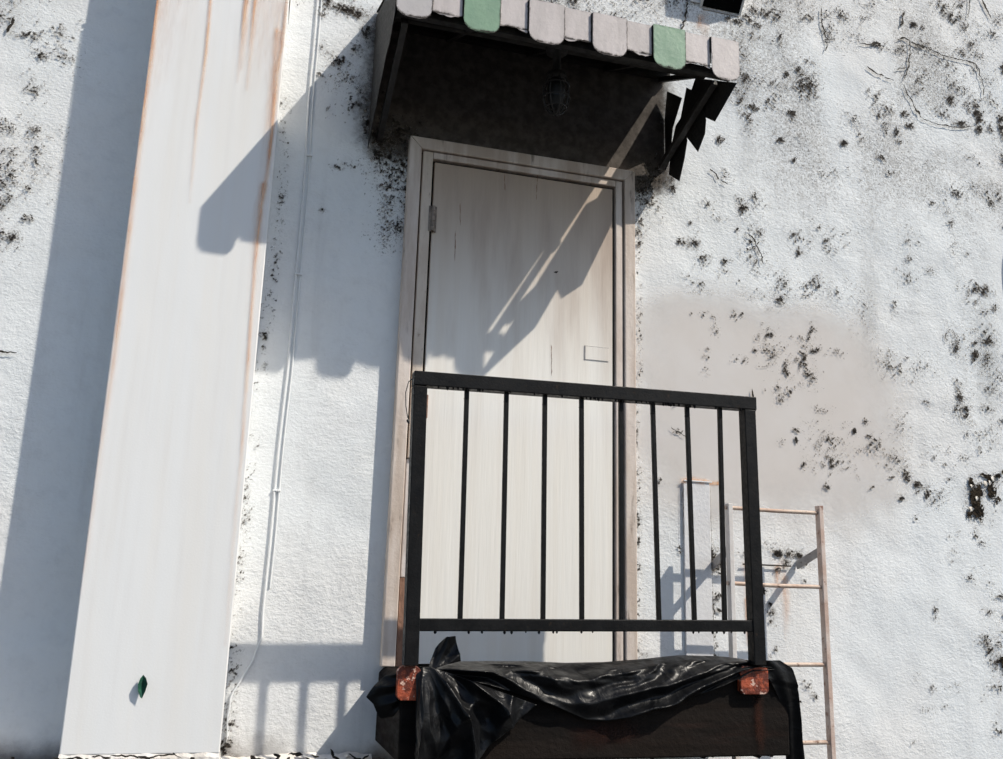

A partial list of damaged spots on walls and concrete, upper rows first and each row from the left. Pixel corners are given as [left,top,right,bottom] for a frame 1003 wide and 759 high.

water stain [0,114,67,262]
water stain [0,0,80,68]
water stain [317,0,697,259]
water stain [715,1,824,136]
water stain [796,0,1003,167]
crack [860,11,984,128]
water stain [930,177,1002,261]
water stain [636,218,950,514]
water stain [944,279,1003,454]
water stain [978,629,1002,702]